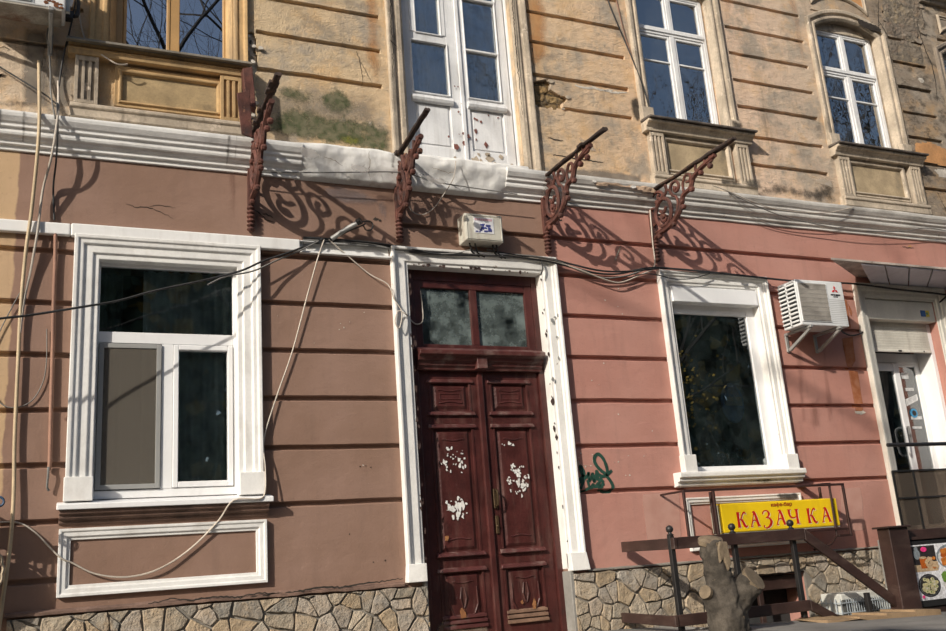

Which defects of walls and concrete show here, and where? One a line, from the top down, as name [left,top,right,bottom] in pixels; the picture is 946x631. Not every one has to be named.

spalling [857,0,927,65]
spalling [533,79,571,110]
peeling [915,142,946,178]